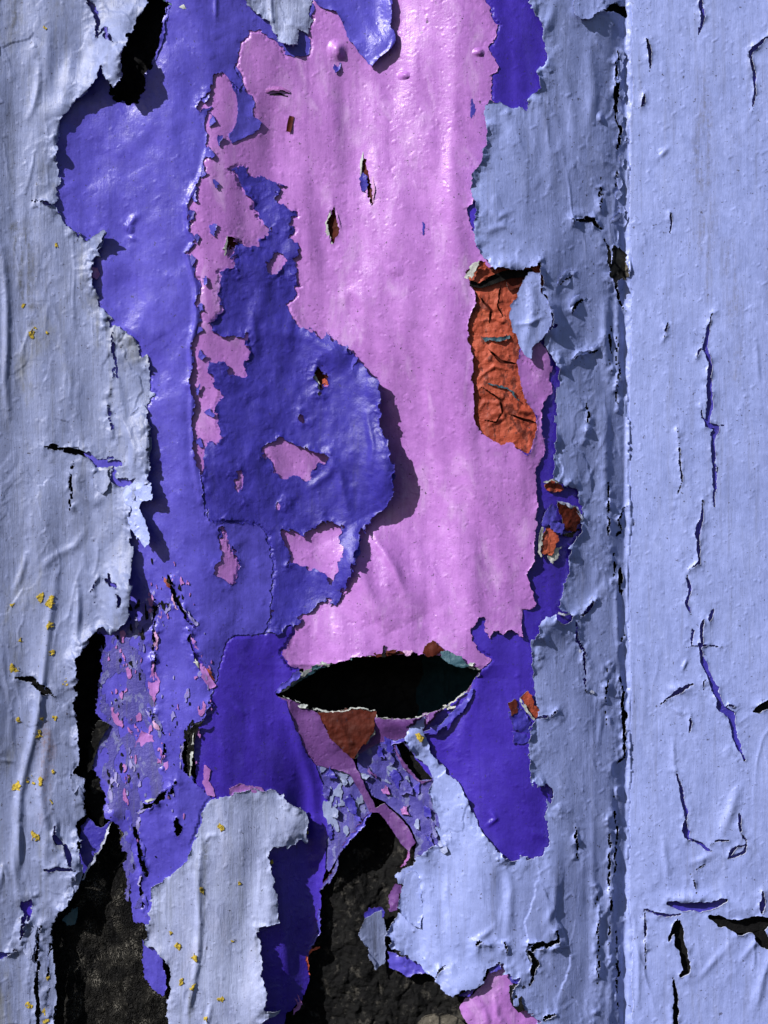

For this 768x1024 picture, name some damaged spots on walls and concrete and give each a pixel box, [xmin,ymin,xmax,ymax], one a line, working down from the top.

peeling [573,0,627,19]
crack [748,37,768,107]
crack [560,275,583,312]
crack [45,444,128,510]
peeling [37,0,594,1024]
crack [661,315,768,760]
crack [572,827,580,859]
crack [595,796,619,1005]
crack [643,774,768,1024]